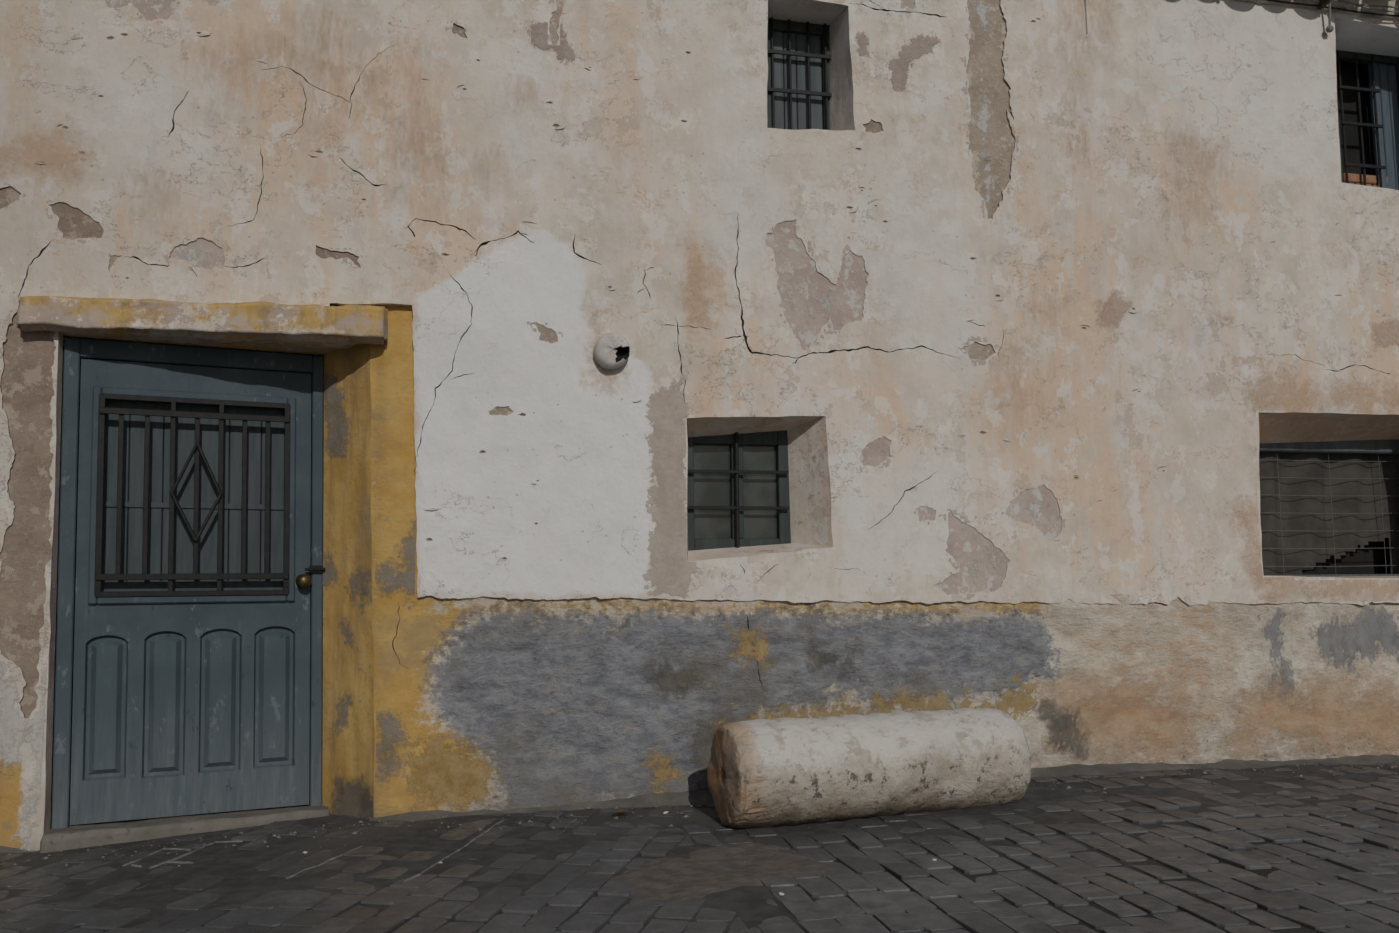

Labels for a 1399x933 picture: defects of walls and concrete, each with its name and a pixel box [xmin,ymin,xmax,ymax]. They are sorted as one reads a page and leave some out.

crack [169,90,189,135]
crack [233,45,396,226]
peeling [889,34,940,91]
flaking render [961,0,1019,220]
crack [18,241,51,301]
flaking render [45,201,104,244]
crack [407,218,534,471]
crack [573,234,601,265]
crack [643,215,957,419]
flaking render [764,220,869,351]
flaking render [0,310,56,736]
flaking render [915,506,1010,599]